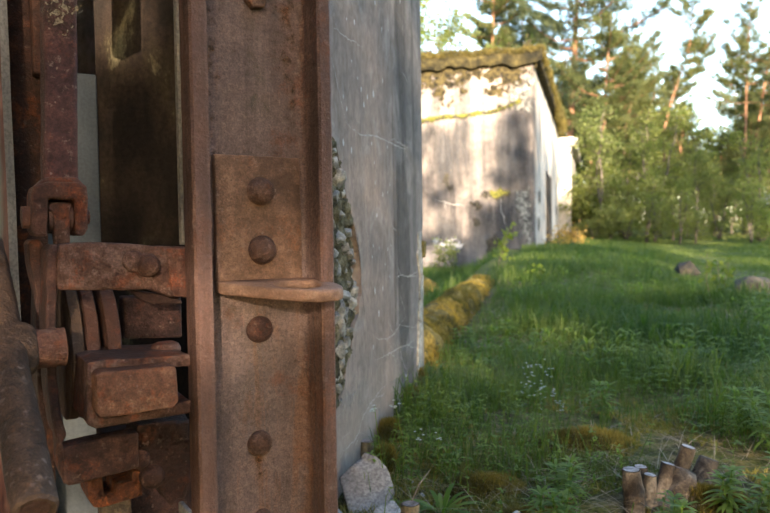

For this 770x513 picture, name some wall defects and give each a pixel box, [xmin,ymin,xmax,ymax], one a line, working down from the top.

leakage [498,118,527,182]
leakage [489,203,512,251]
spalling [332,139,365,410]